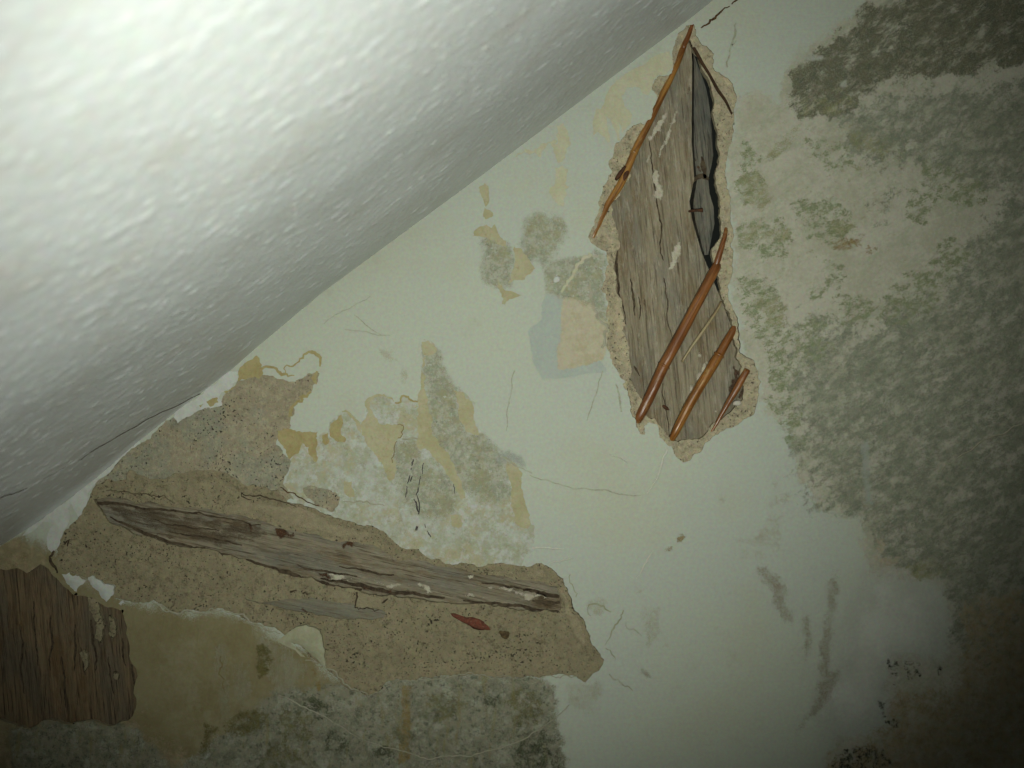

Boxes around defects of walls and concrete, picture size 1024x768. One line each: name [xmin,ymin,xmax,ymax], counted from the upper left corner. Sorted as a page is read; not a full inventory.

leakage [7,636,571,768]
flaking render [0,339,604,768]
peeling [472,0,1024,768]
leakage [731,0,1024,733]